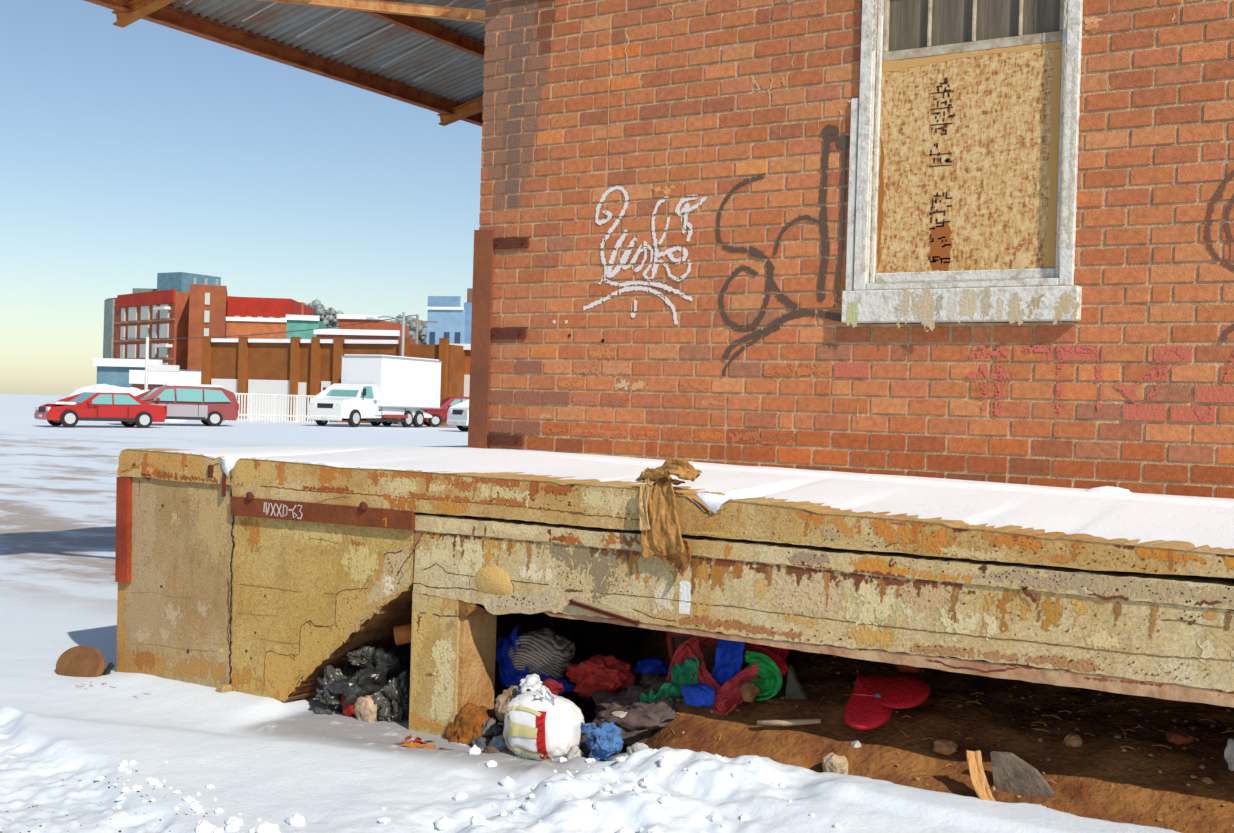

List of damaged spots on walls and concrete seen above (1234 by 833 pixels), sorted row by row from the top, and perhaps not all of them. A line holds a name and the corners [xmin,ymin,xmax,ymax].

rust [303,466,353,493]
rust [368,470,574,527]
crack [130,471,639,684]
rust [423,525,653,588]
spalling [487,566,640,626]
spalling [771,528,845,619]
rust [670,509,1163,688]
spalling [894,579,961,620]
spalling [970,565,1234,607]
rust [1194,599,1232,631]